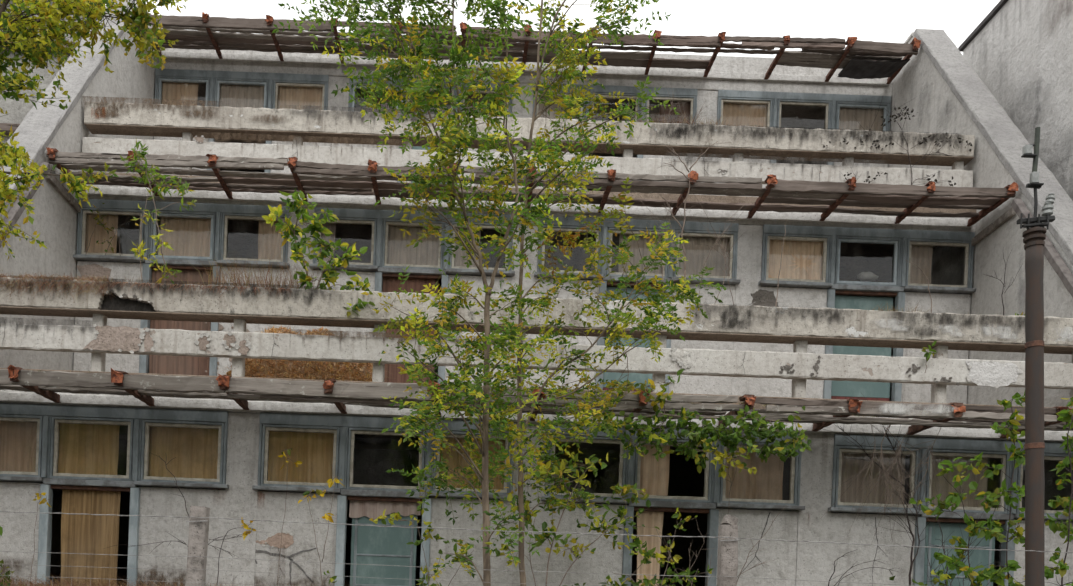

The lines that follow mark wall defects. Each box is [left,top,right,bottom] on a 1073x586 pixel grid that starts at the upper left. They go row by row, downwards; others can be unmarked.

leakage [83,96,216,119]
leakage [208,115,407,152]
leakage [667,123,726,137]
leakage [743,125,962,144]
spalling [76,264,156,312]
flaking render [747,289,779,307]
mould [699,303,761,328]
mould [778,306,842,320]
leakage [880,312,1025,338]
peeling [83,324,155,354]